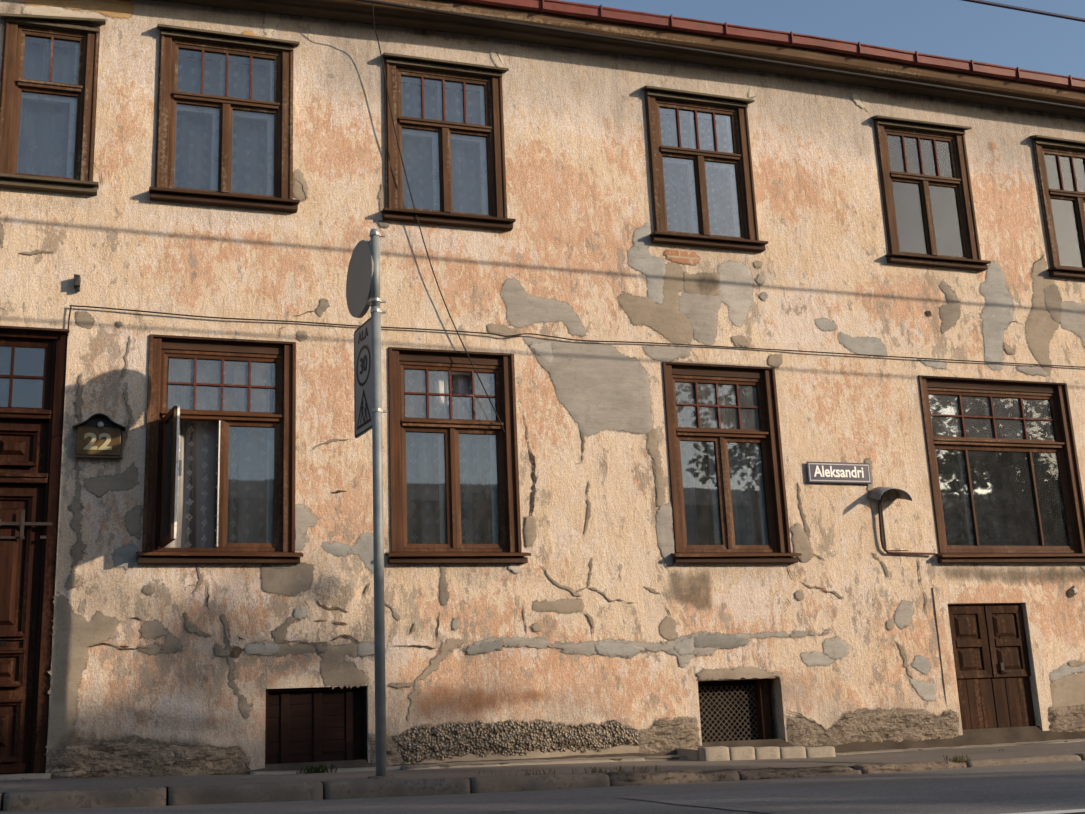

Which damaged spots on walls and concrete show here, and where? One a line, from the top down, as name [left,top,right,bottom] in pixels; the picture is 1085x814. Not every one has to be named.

flaking render [664,246,700,265]
peeling [732,335,749,348]
crack [271,415,844,721]
crack [183,564,253,719]
flaking render [658,607,678,641]
flaking render [45,591,250,778]
flaking render [1047,659,1085,732]
flaking render [368,717,700,767]
flaking render [786,707,959,747]